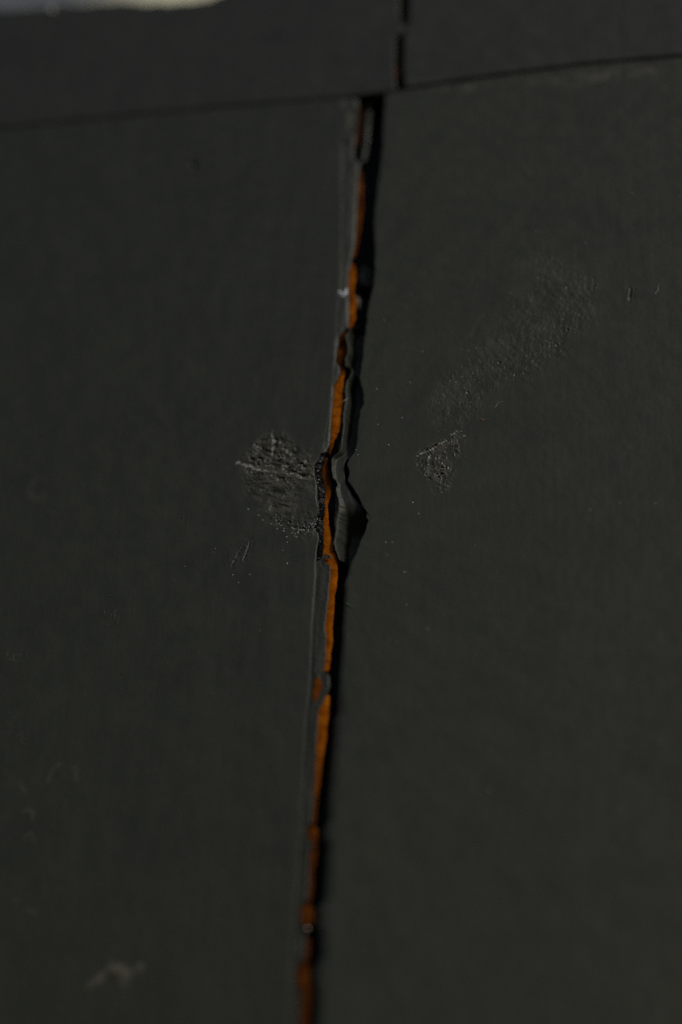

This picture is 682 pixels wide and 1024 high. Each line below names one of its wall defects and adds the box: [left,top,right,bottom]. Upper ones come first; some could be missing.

spalling [236,426,321,548]
spalling [412,418,476,498]
crack [290,98,375,1024]